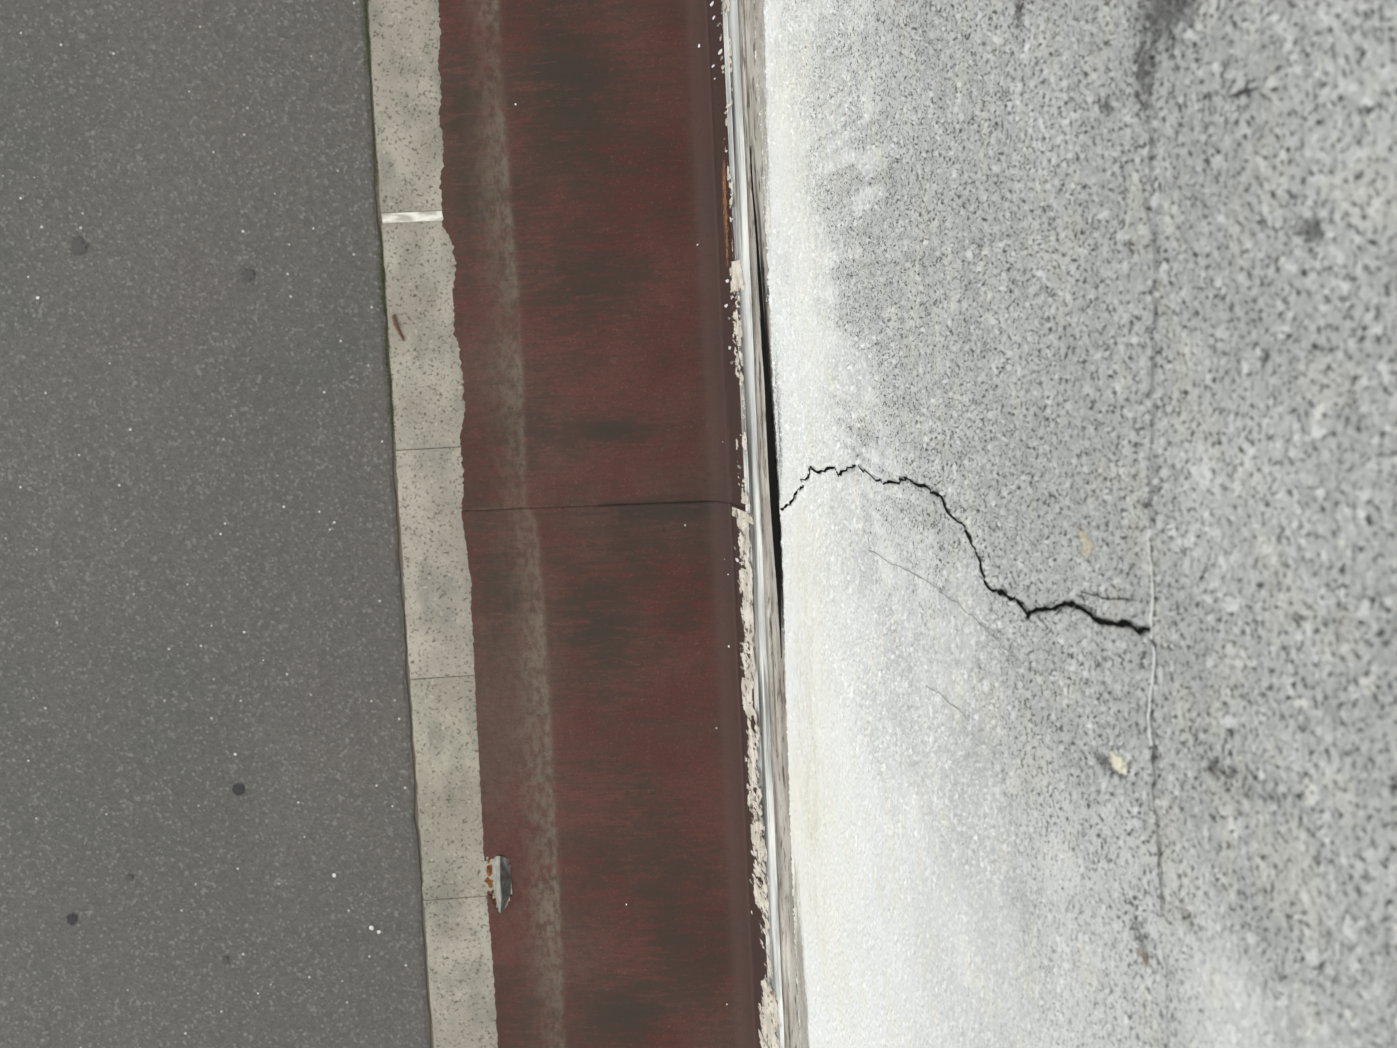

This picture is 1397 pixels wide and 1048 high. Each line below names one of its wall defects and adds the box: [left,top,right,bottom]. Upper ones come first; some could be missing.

crack [749,52,1168,1048]